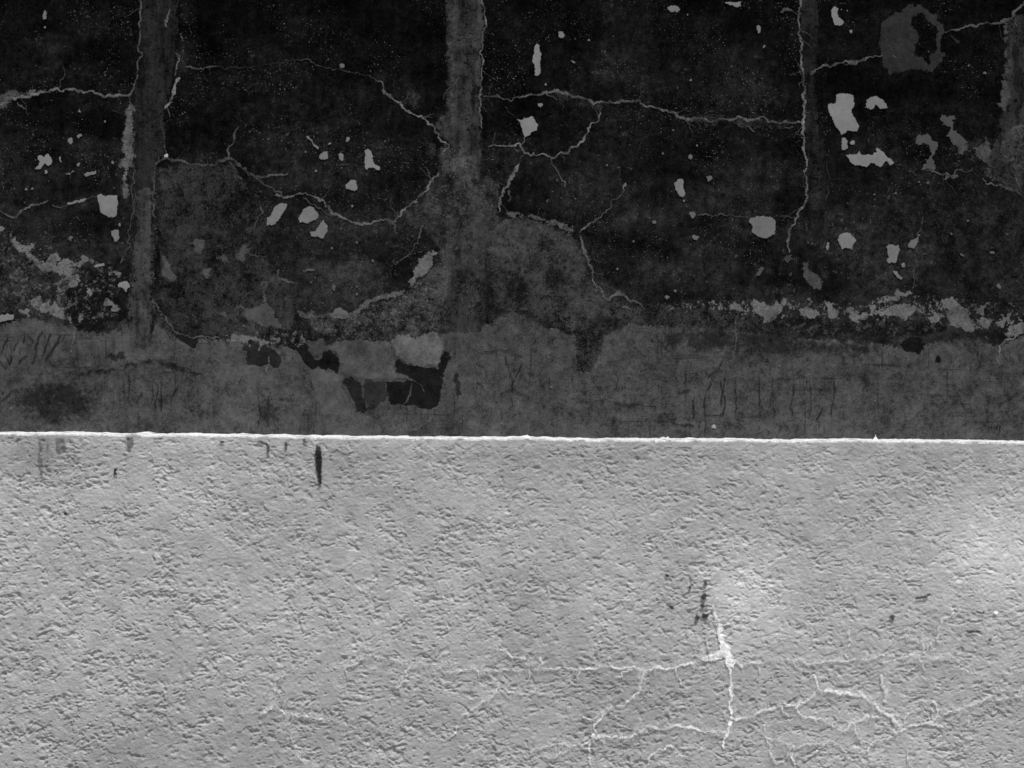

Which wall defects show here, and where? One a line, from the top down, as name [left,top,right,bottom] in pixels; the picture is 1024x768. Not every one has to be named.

crack [945,2,1024,44]
peeling [305,136,350,172]
crack [0,0,882,328]
peeling [517,103,543,138]
peeling [828,93,894,167]
crack [897,164,1021,289]
flaking render [0,231,130,329]
flaking render [157,160,447,413]
flaking render [486,216,956,373]
spalling [386,352,461,410]
crack [344,597,1024,767]